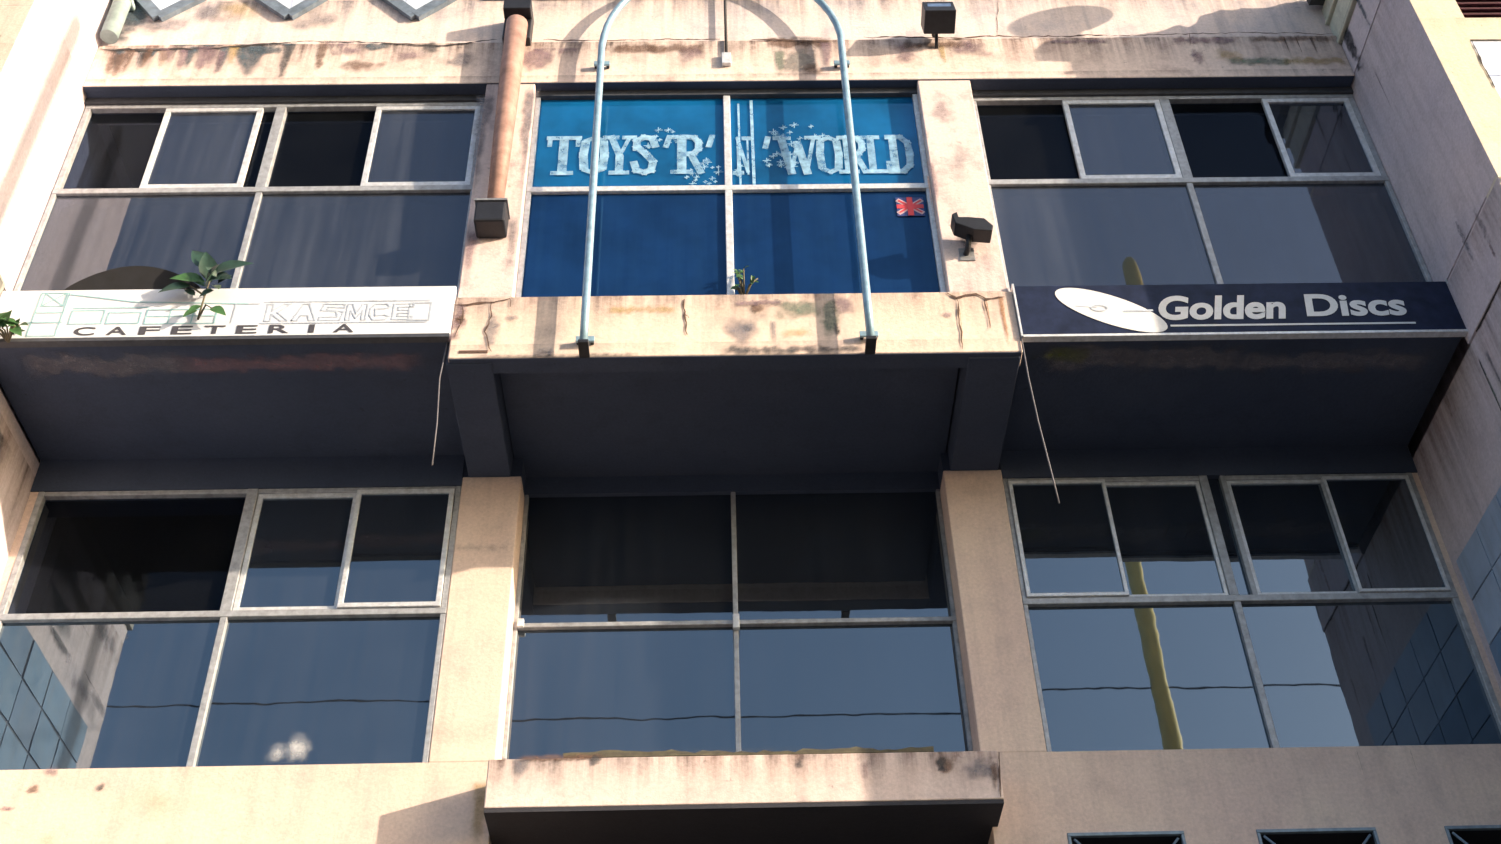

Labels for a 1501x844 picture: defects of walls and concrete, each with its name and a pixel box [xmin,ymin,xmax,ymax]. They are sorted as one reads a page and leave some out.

leakage [107,0,295,76]
leakage [317,41,359,67]
leakage [1231,37,1316,64]
crack [454,298,511,352]
leakage [729,300,858,354]
crack [947,293,1001,349]
leakage [516,754,600,772]